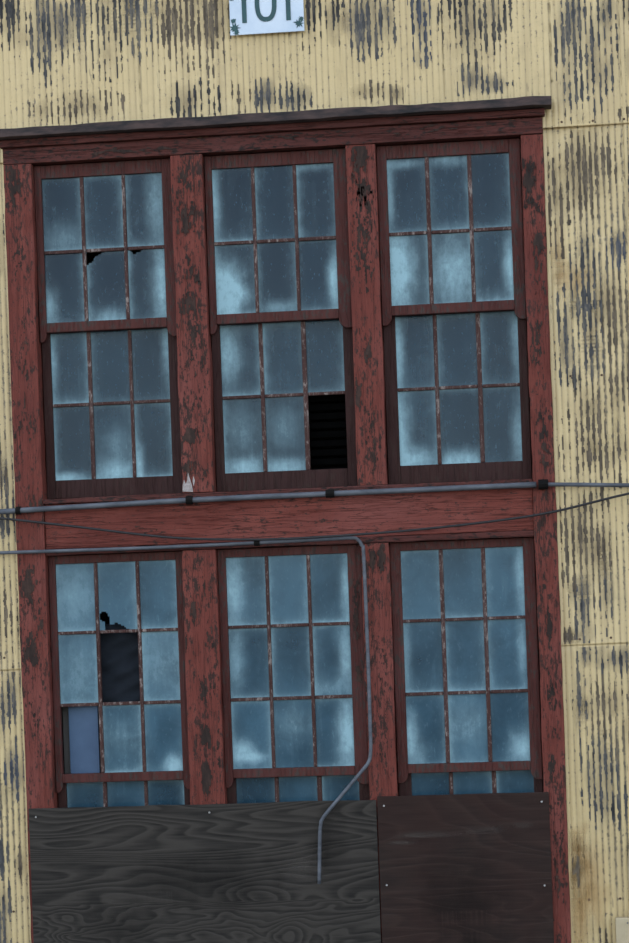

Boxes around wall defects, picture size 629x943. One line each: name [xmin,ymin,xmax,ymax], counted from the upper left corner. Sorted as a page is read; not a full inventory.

peeling [0,0,313,125]
peeling [3,165,26,280]
peeling [348,146,376,294]
peeling [172,161,210,492]
peeling [0,317,42,547]
peeling [522,0,629,831]
peeling [0,564,46,803]
peeling [184,576,219,708]
peeling [352,578,388,687]
peeling [201,723,221,801]
peeling [555,831,580,903]